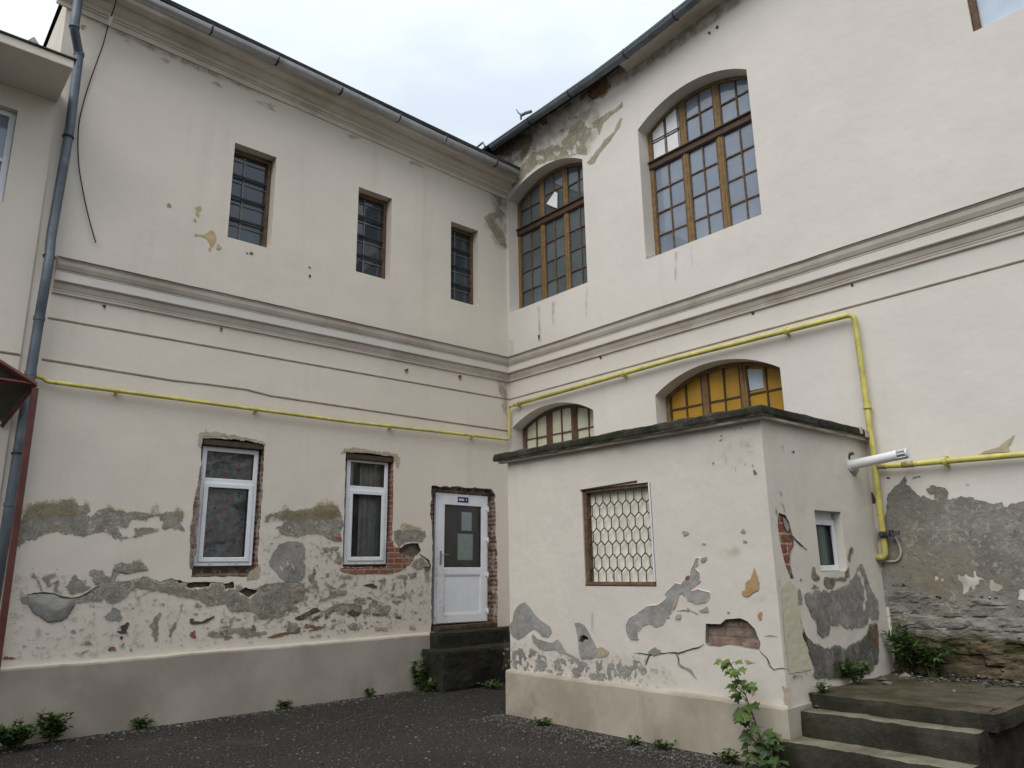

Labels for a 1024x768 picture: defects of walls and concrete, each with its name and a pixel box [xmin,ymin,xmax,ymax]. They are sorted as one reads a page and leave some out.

flaking render [490,102,623,188]
flaking render [194,230,222,251]
flaking render [484,195,507,247]
flaking render [198,430,266,447]
flaking render [981,435,1014,454]
flaking render [17,465,202,569]
flaking render [21,501,426,651]
flaking render [505,602,667,686]
crack [638,644,704,679]
flaking render [625,543,762,664]
flaking render [776,476,1024,685]